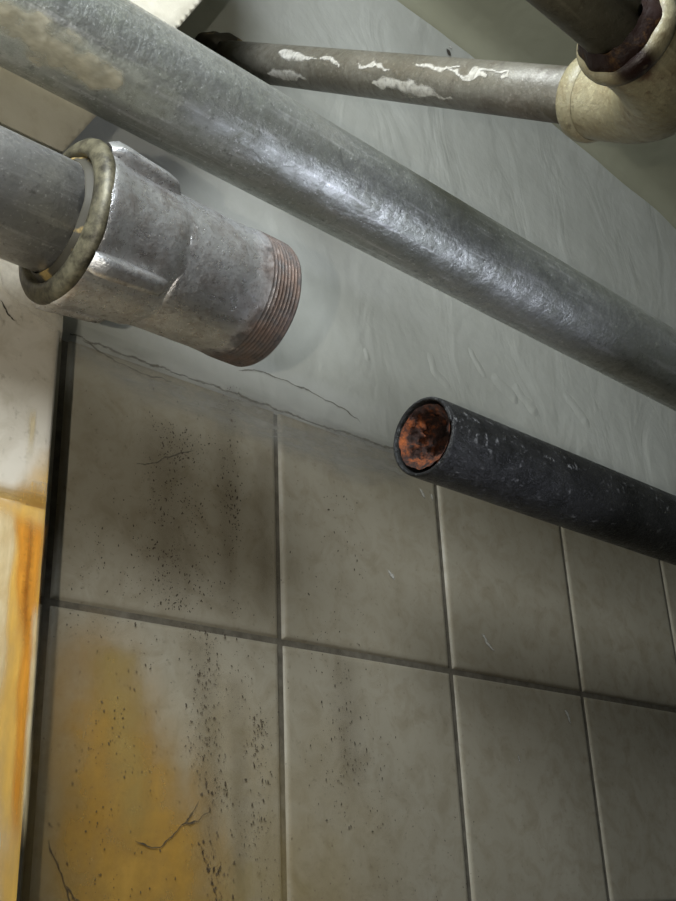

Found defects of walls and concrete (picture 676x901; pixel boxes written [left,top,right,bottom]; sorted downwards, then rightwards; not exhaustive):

crack [71,334,393,449]
leakage [106,411,250,613]
rust [0,484,47,901]
crack [136,803,210,848]
leakage [179,626,282,901]